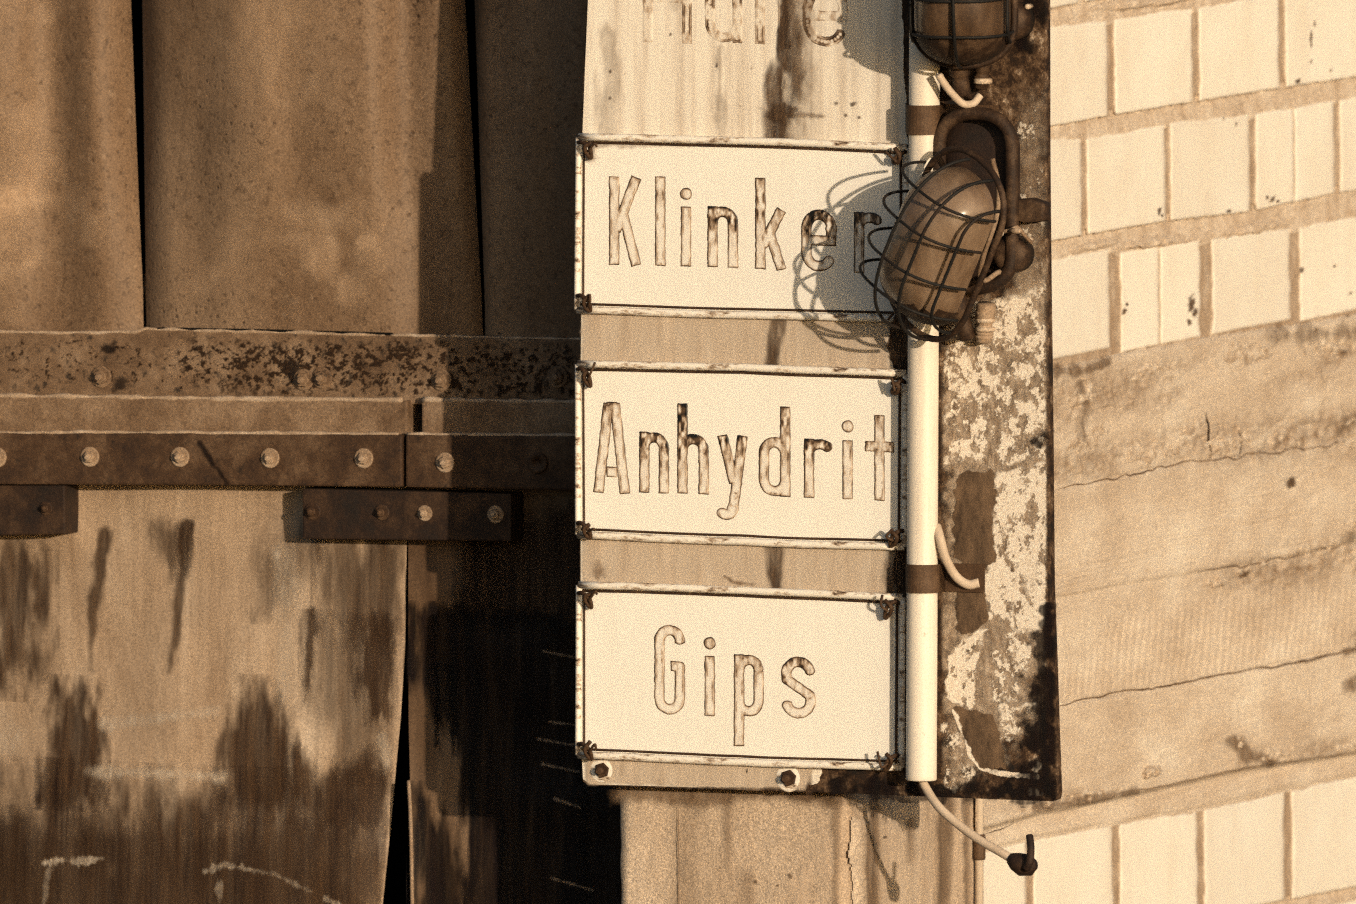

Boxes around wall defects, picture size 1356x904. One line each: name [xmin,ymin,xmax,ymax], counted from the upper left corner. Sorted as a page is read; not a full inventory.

rust [765,0,807,138]
rust [3,314,903,400]
peeling [941,262,1108,789]